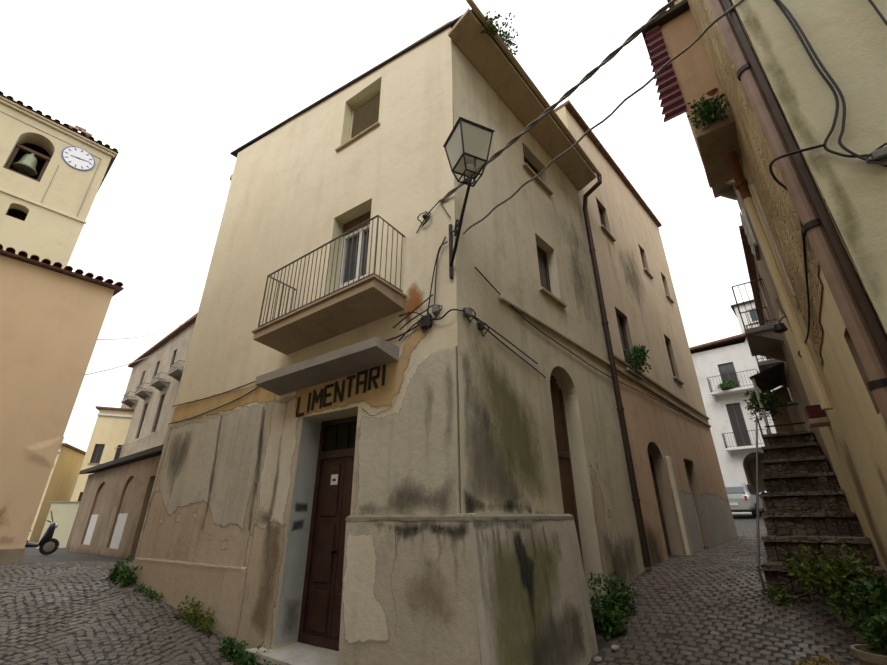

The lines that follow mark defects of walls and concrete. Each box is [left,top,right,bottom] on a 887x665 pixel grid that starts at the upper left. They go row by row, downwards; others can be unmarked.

corrosion [405,287,422,321]
peeling [159,385,276,529]
peeling [342,533,389,644]
water stain [396,522,480,537]
water stain [465,495,483,513]
water stain [505,522,535,623]